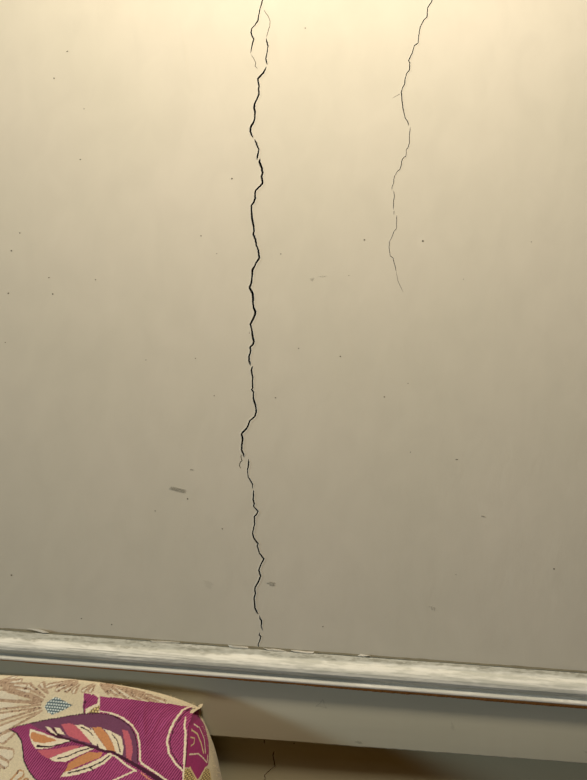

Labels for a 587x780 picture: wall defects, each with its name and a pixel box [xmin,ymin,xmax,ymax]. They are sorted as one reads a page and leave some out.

crack [239,0,271,647]
crack [388,0,435,289]